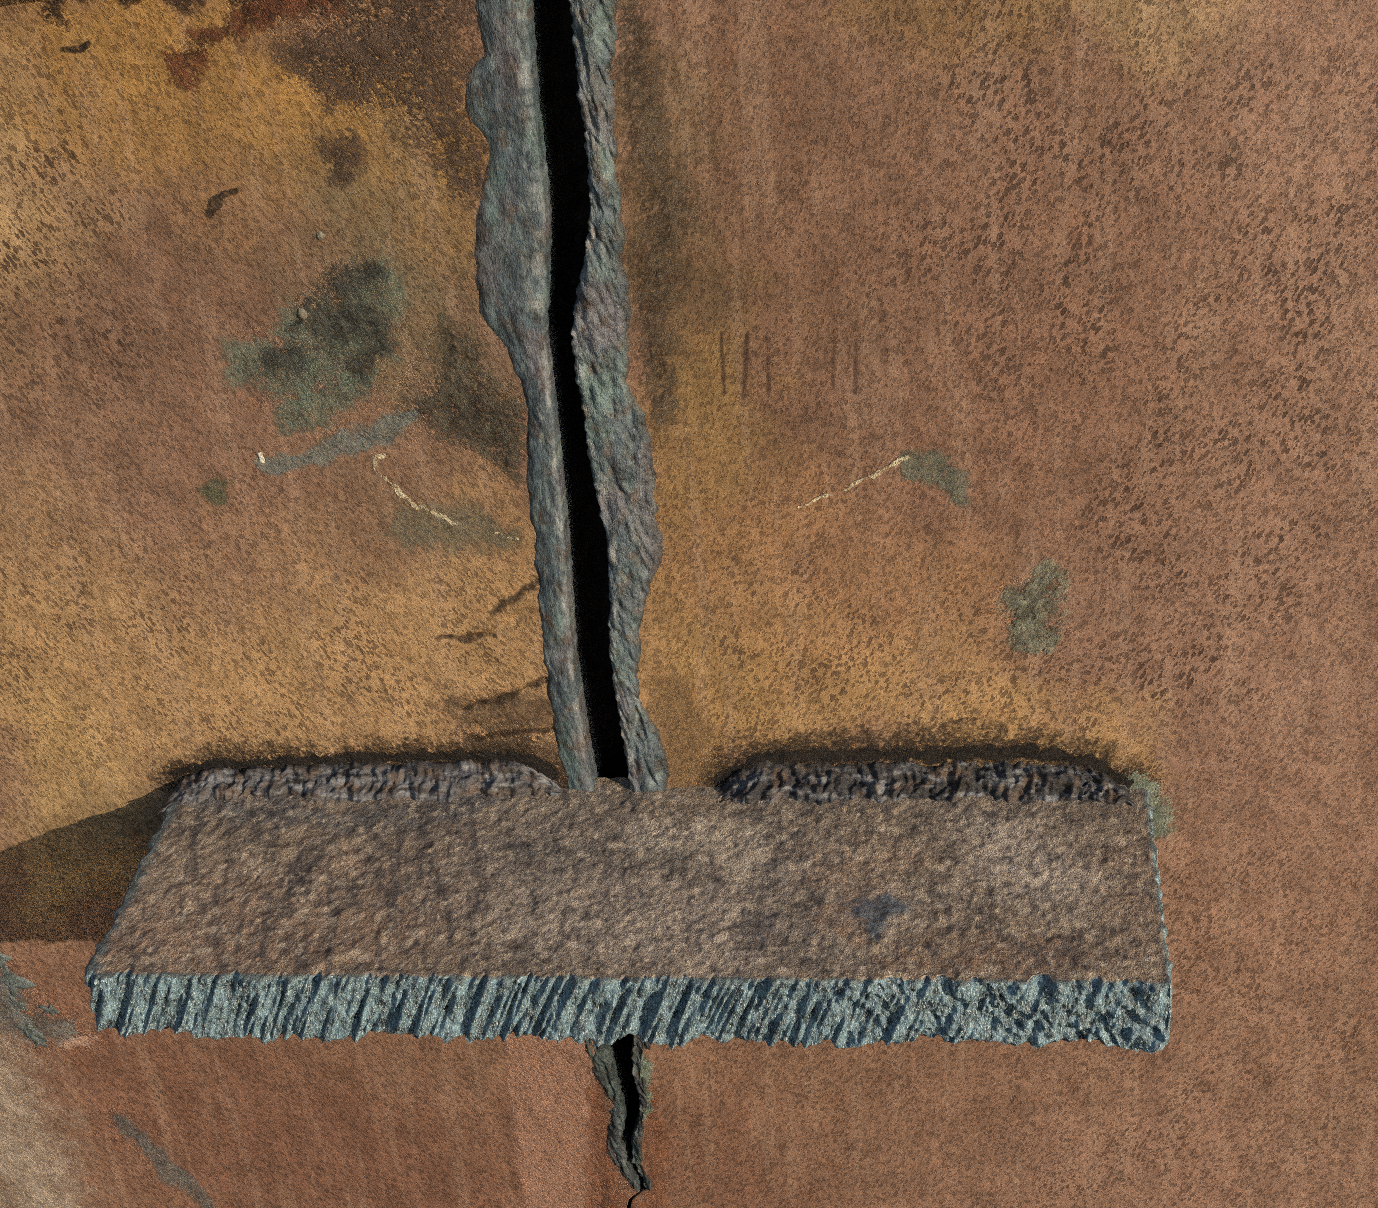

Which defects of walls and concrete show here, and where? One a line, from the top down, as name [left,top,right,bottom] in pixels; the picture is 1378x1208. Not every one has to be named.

crack [438,0,670,792]
crack [585,1034,653,1208]